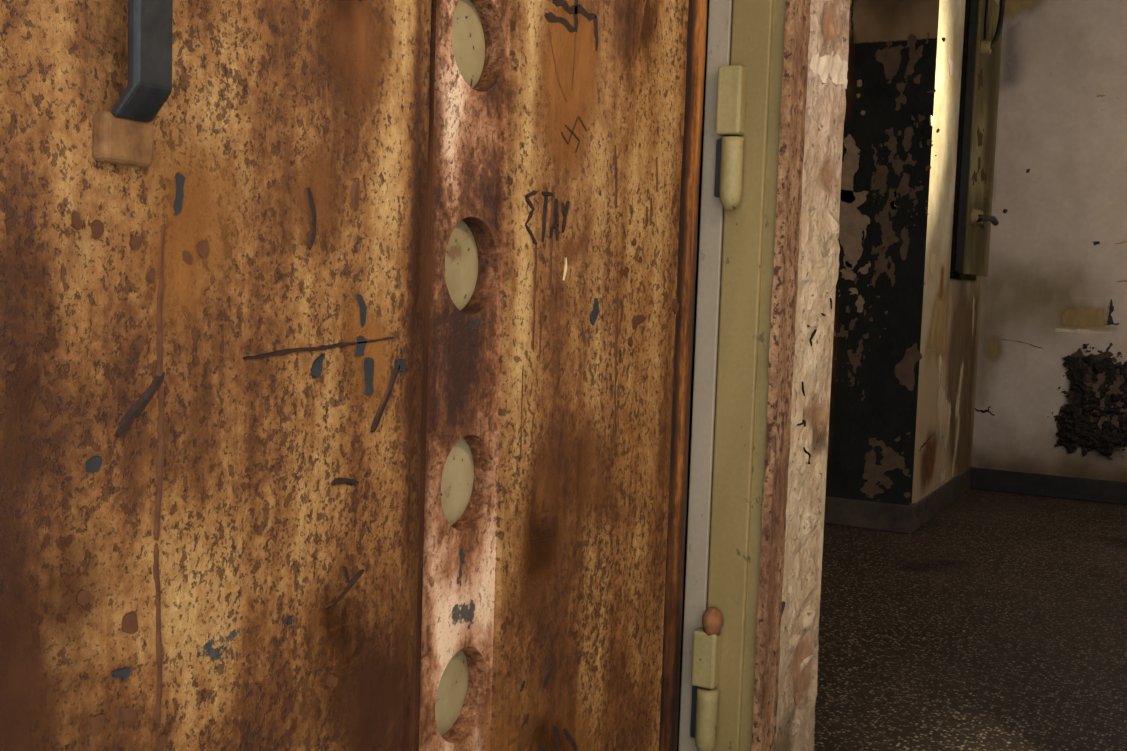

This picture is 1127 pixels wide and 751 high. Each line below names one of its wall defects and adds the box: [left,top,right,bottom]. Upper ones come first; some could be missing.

corrosion [543,16,597,165]
crack [848,0,856,50]
corrosion [532,186,588,362]
corrosion [645,157,658,226]
peeling [820,32,945,401]
corrosion [350,307,385,394]
corrosion [408,64,440,751]
peeling [860,432,911,501]
spalling [1047,299,1127,459]